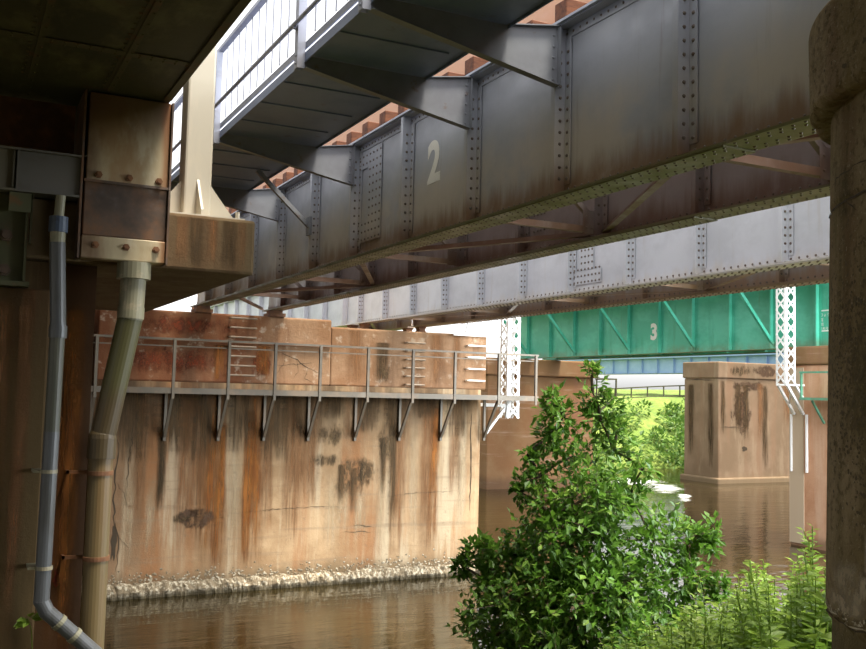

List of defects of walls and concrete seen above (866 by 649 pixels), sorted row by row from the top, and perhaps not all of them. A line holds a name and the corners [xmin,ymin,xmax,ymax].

rust [52,312,80,615]
rust [133,345,223,378]
damp [149,393,216,515]
rust [178,396,227,559]
rust [242,397,272,552]
damp [229,391,341,454]
crack [277,352,316,381]
rust [285,397,317,531]
damp [313,397,408,532]
damp [419,393,438,417]
damp [708,366,775,464]
spalling [827,238,866,537]